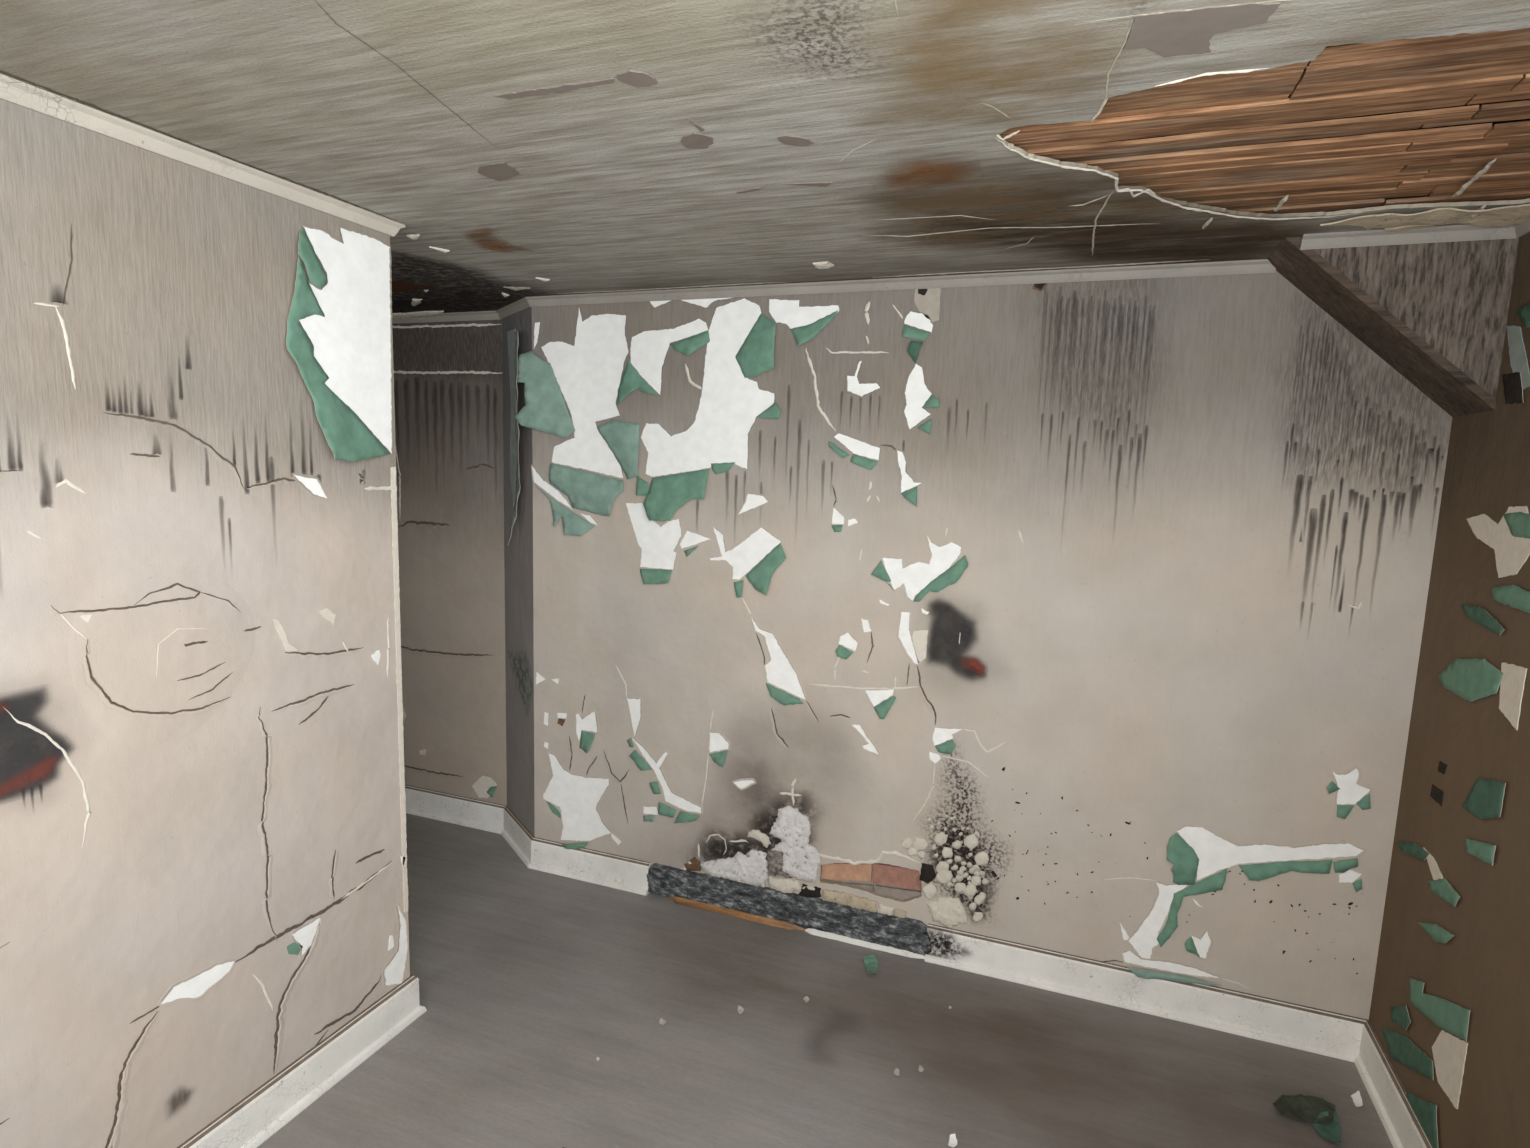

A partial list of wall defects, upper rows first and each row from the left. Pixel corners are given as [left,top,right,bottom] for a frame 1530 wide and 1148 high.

crack [34,223,76,389]
leakage [42,479,62,506]
leakage [233,452,272,492]
peeling [507,297,842,723]
leakage [1295,476,1438,563]
crack [51,583,200,639]
peeling [286,223,450,989]
crack [3,707,91,847]
crack [105,608,493,1148]
flaking render [681,805,922,918]
leakage [901,767,1029,929]
peeling [1102,824,1367,989]